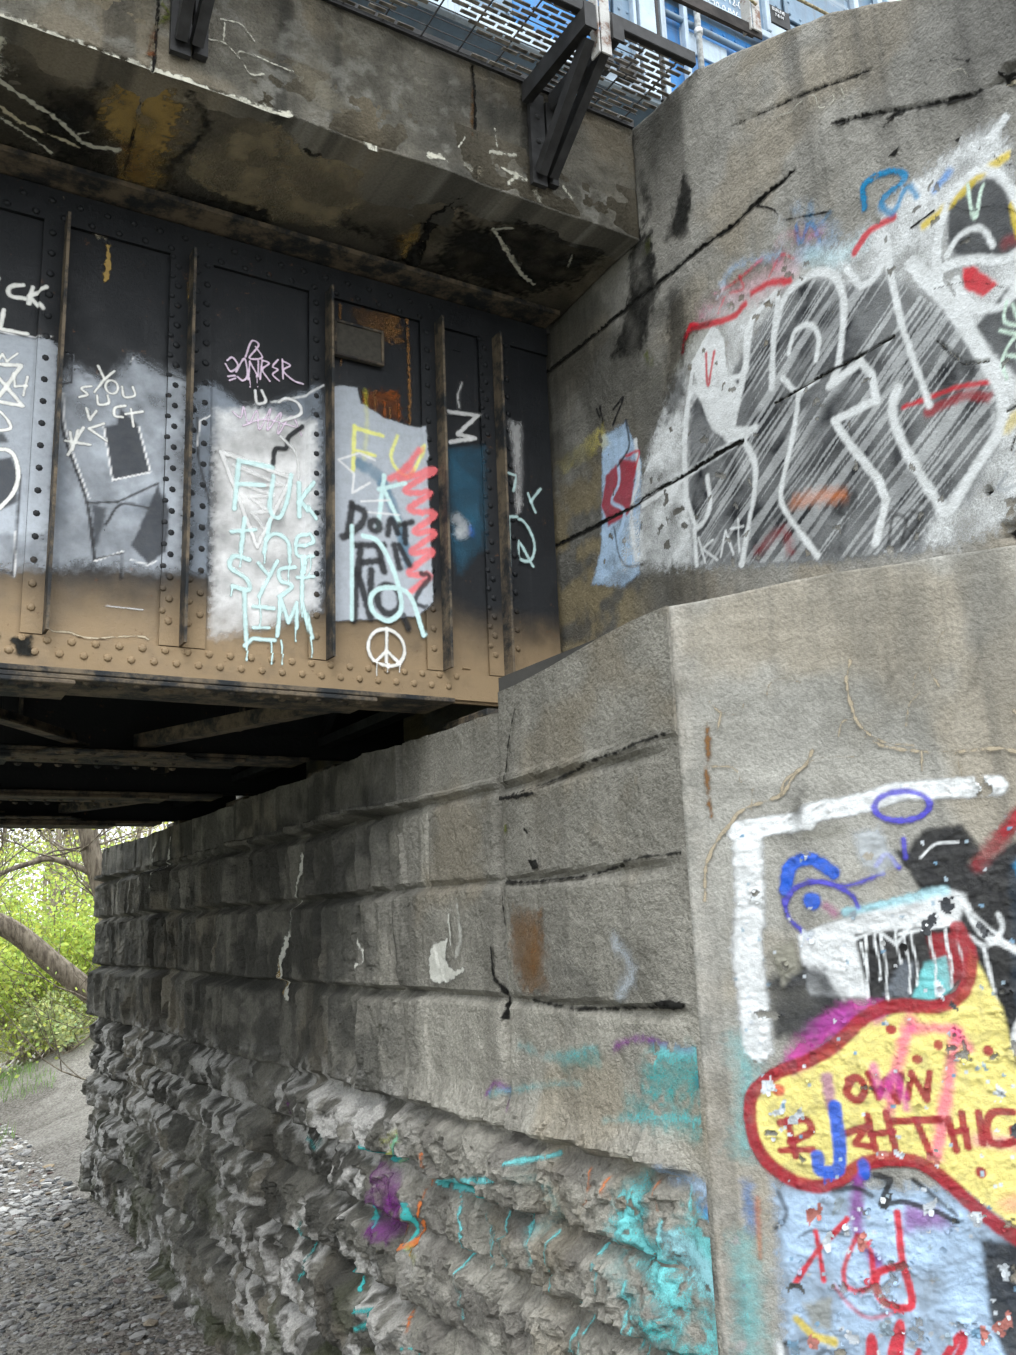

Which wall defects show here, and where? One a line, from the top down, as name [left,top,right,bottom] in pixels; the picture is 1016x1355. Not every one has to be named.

crack [741,68,1002,128]
water stain [426,206,604,299]
crack [547,169,795,373]